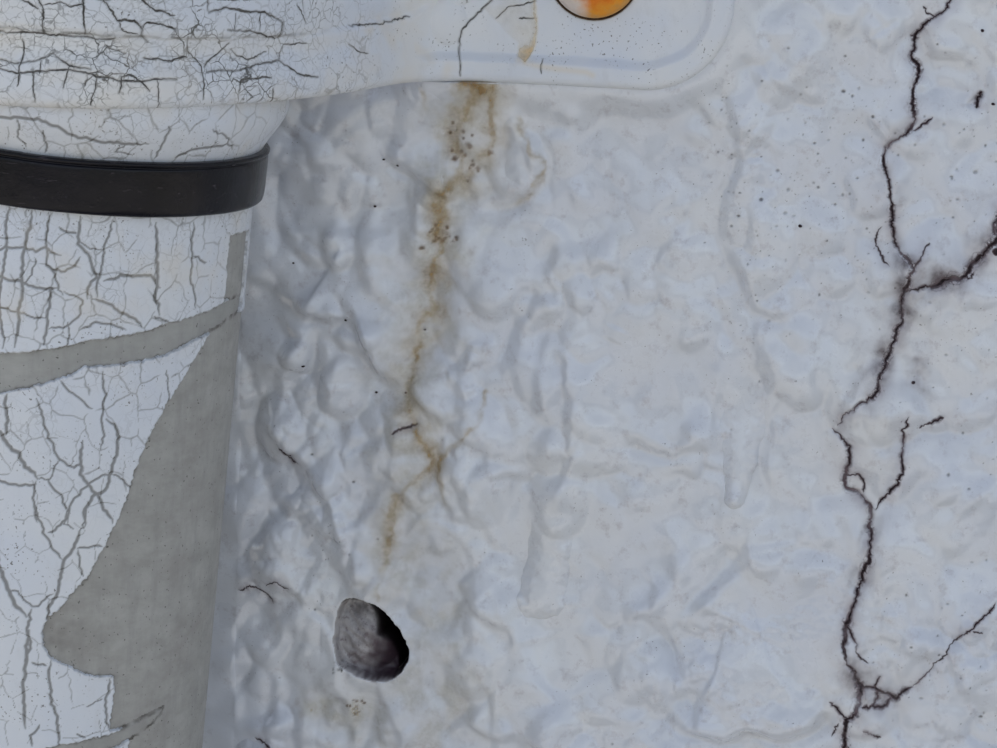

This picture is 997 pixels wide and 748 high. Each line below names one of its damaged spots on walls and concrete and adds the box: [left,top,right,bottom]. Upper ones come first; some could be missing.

crack [0,0,315,105]
crack [353,16,410,54]
crack [458,0,534,73]
corrosion [556,0,632,21]
corrosion [460,81,491,102]
crack [829,0,997,748]
crack [240,582,287,601]
spalling [332,598,409,682]